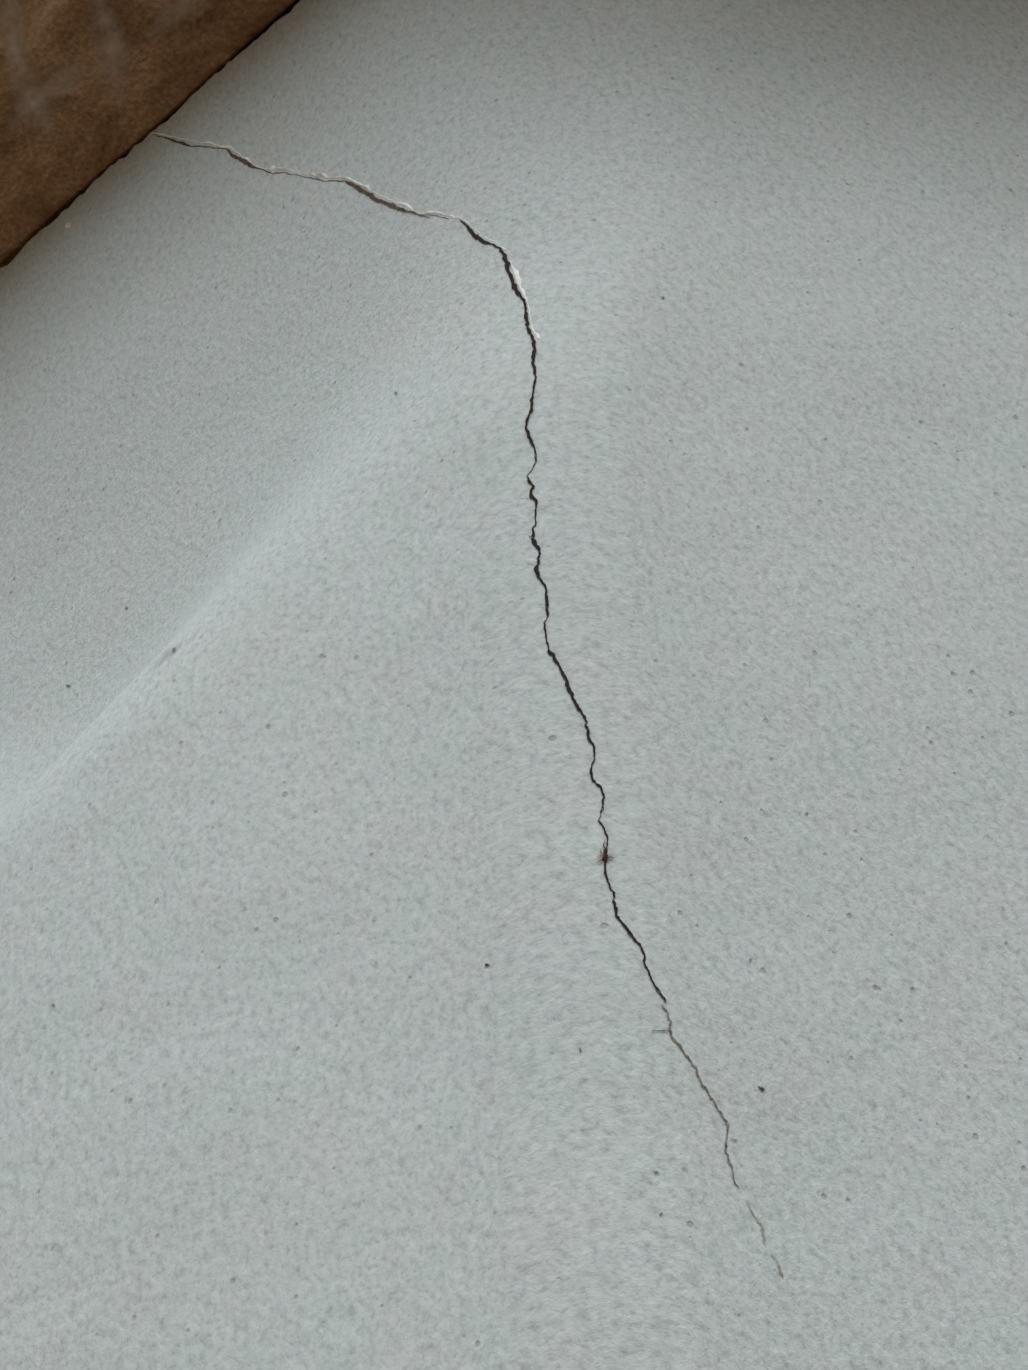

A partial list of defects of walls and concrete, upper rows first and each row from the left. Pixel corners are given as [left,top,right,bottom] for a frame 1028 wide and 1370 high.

crack [151,132,784,1277]